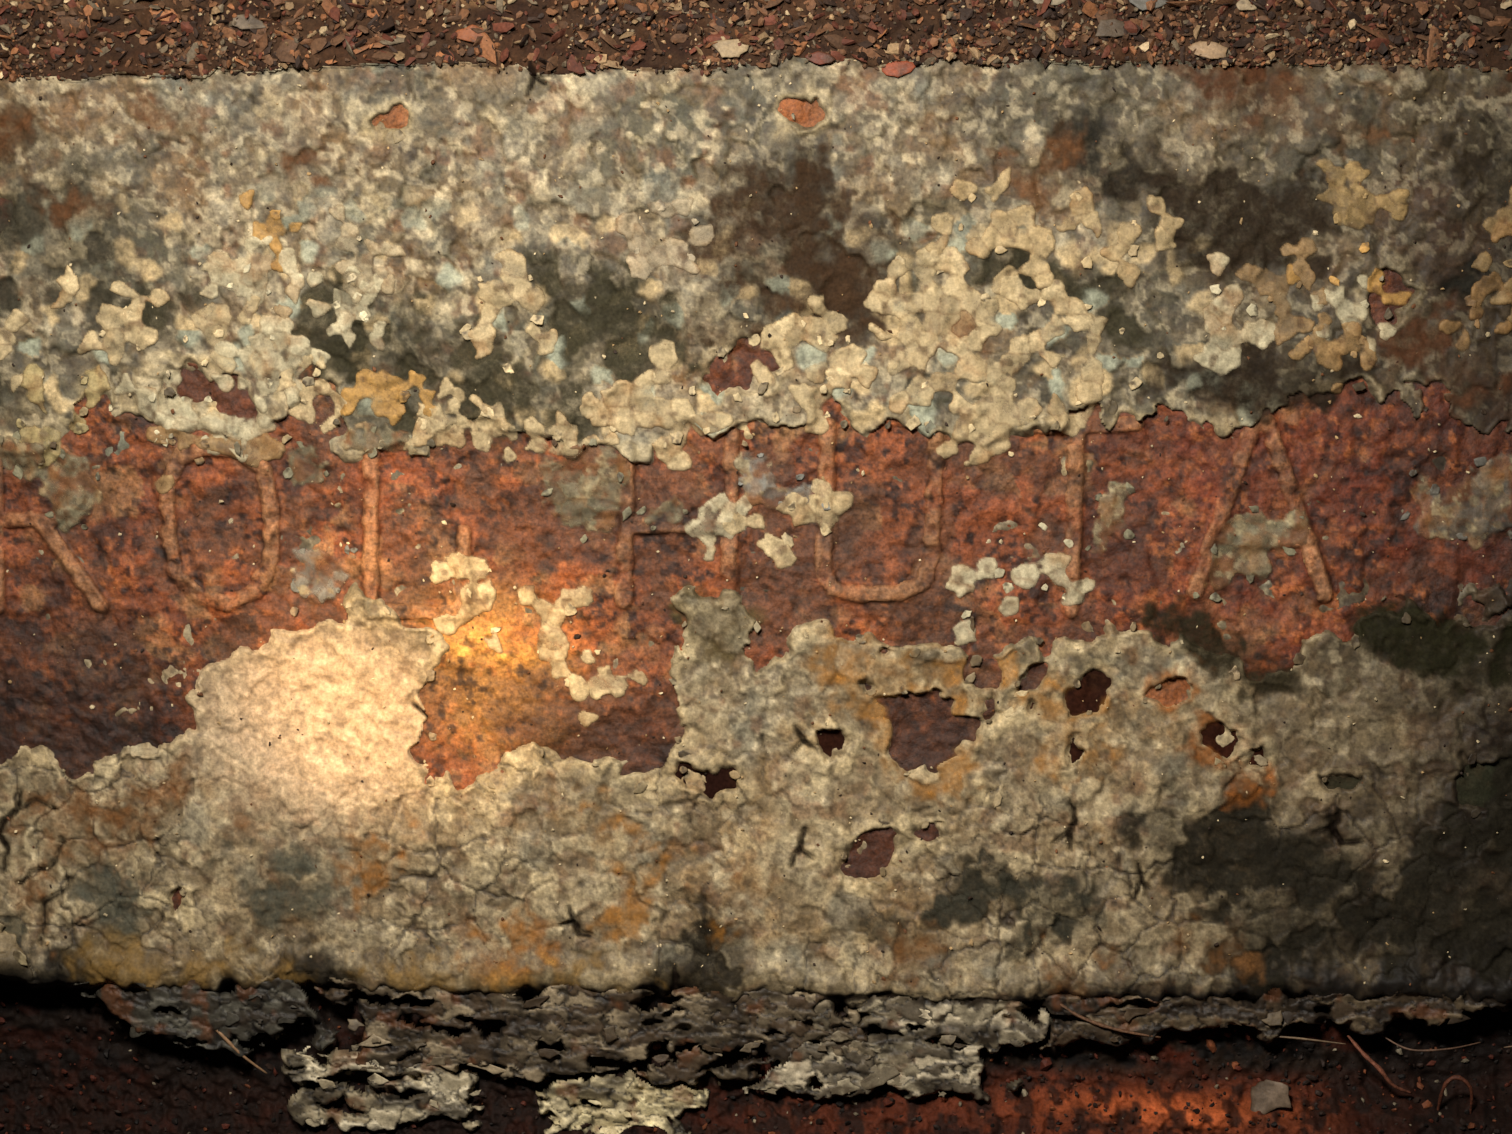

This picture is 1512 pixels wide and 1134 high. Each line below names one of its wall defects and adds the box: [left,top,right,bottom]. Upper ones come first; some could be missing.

peeling [0,189,854,569]
peeling [743,168,1184,466]
corrosion [0,269,1512,798]
spalling [865,481,1136,776]
crack [0,791,69,943]
crack [790,830,812,866]
crack [1058,802,1077,848]
corrosion [0,986,299,1134]
peeling [70,976,1512,1134]
corrosion [654,1062,962,1134]
crack [796,991,1090,1005]
corrosion [979,1007,1512,1134]